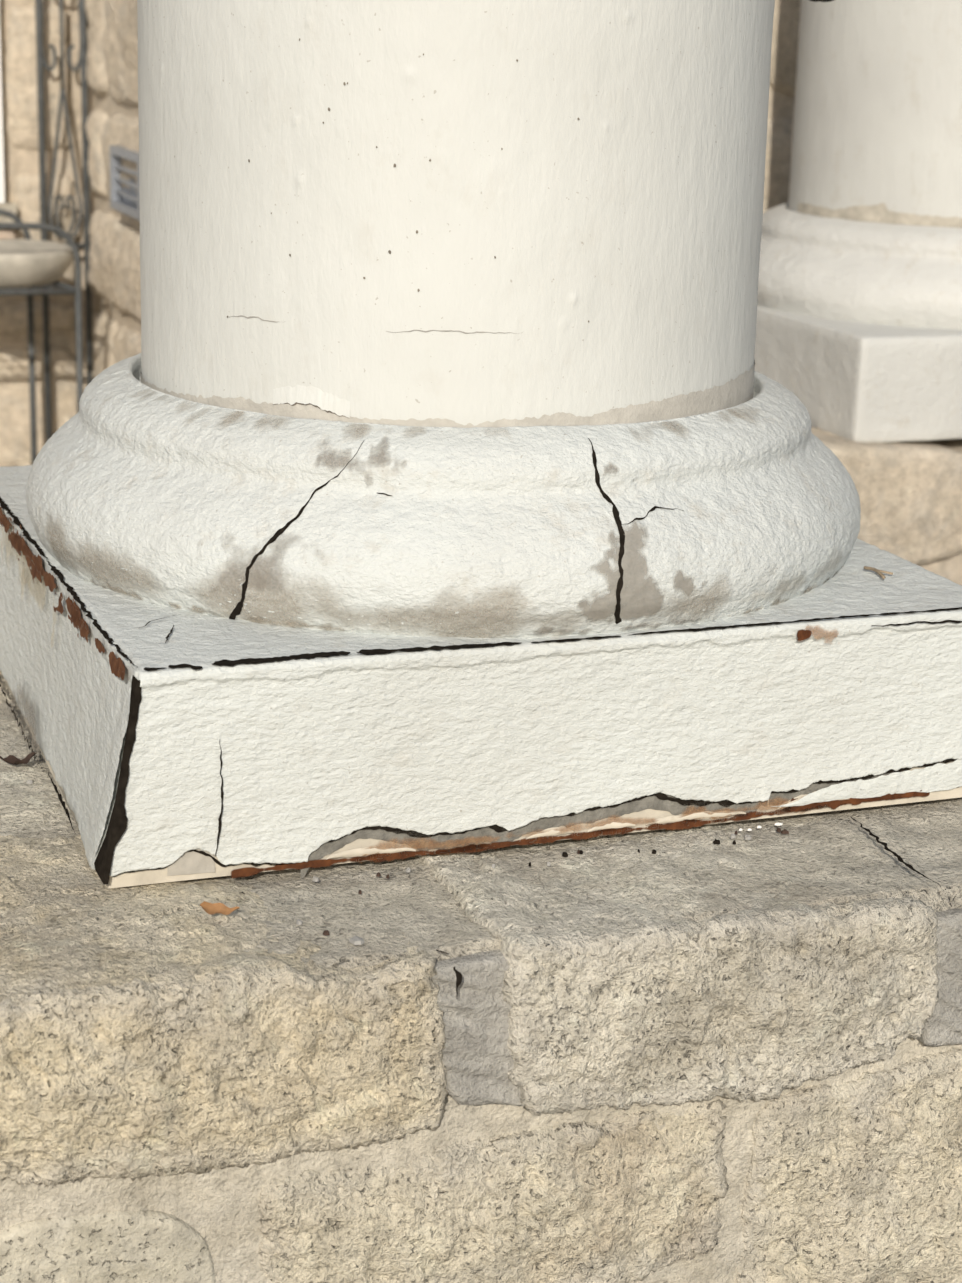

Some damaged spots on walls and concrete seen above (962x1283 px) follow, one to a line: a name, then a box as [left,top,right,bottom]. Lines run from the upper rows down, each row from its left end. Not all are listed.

rust [0,507,125,680]
crack [0,438,962,887]
flaking render [167,849,215,876]
rust [231,790,930,878]
flaking render [300,759,962,879]